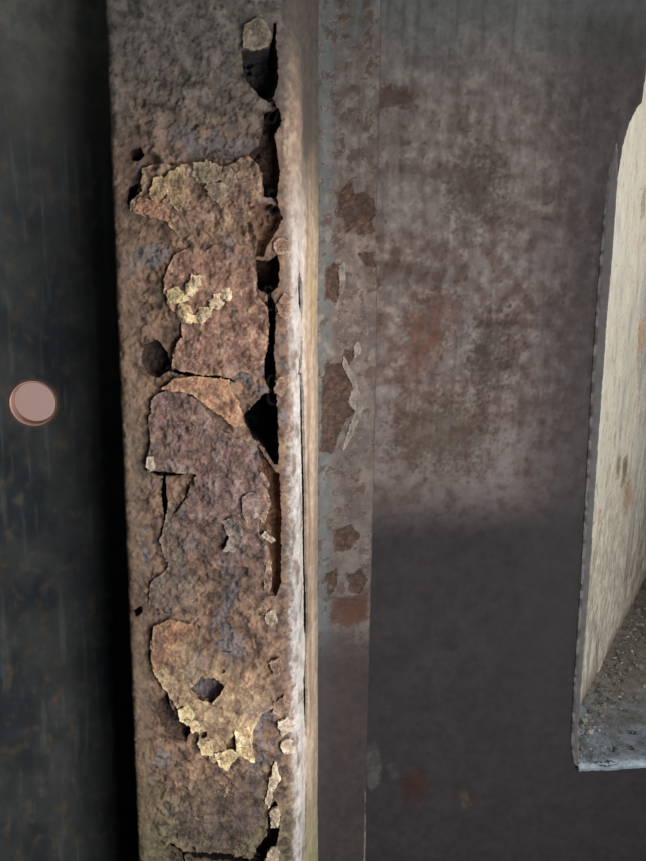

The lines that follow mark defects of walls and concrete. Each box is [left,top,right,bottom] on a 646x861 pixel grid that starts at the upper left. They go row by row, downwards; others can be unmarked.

rust [242,18,271,51]
peeling [135,159,239,223]
rust [162,376,244,428]
crack [266,374,277,406]
peeling [319,342,364,454]
crack [298,358,306,634]
spalling [192,677,224,698]
crack [300,669,308,722]
spalling [158,694,255,772]
rust [265,694,296,828]
crack [161,840,263,861]
rust [264,846,280,861]